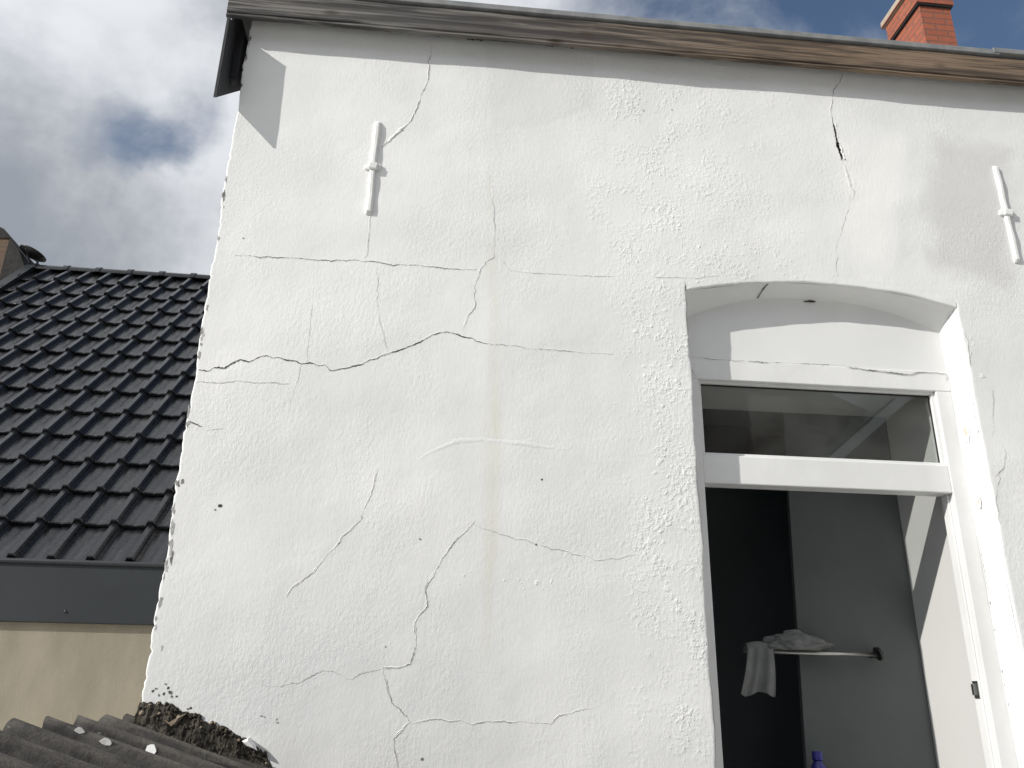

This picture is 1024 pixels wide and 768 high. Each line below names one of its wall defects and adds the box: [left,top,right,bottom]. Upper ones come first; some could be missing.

crack [381,45,432,148]
crack [829,74,845,160]
crack [197,190,611,402]
crack [285,469,378,597]
crack [263,520,635,768]
spalling [133,683,272,768]